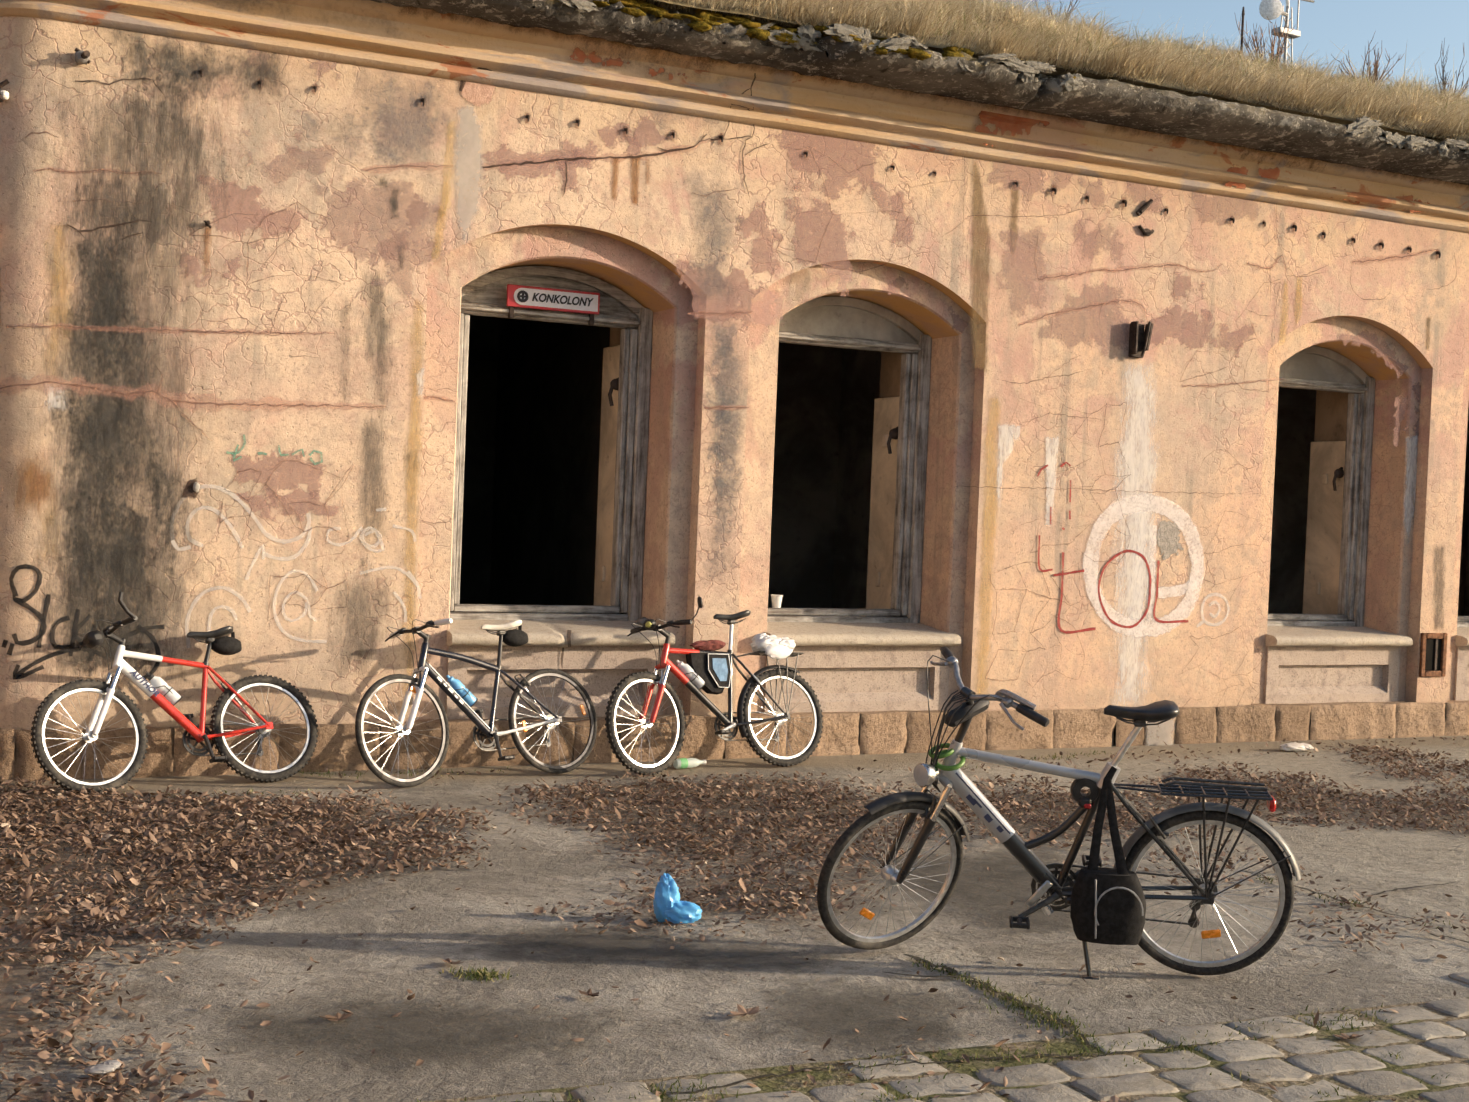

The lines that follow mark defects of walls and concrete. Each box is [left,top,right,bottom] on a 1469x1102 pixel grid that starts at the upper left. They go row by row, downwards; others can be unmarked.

peeling [570,47,630,67]
crack [324,144,446,171]
corrosion [613,158,649,203]
crack [483,73,922,272]
peeling [975,111,1050,147]
peeling [676,129,914,328]
water stain [49,31,280,666]
peeling [1141,267,1254,358]